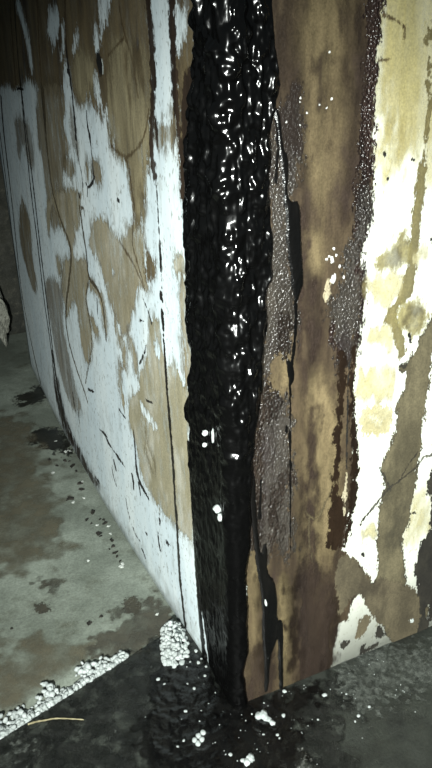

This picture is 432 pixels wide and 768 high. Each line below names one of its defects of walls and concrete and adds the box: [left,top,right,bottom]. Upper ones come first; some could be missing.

damp [30,580,63,614]
damp [0,591,173,708]
damp [0,0,194,576]
crack [95,409,171,559]
damp [244,0,432,701]
peeling [334,315,432,655]